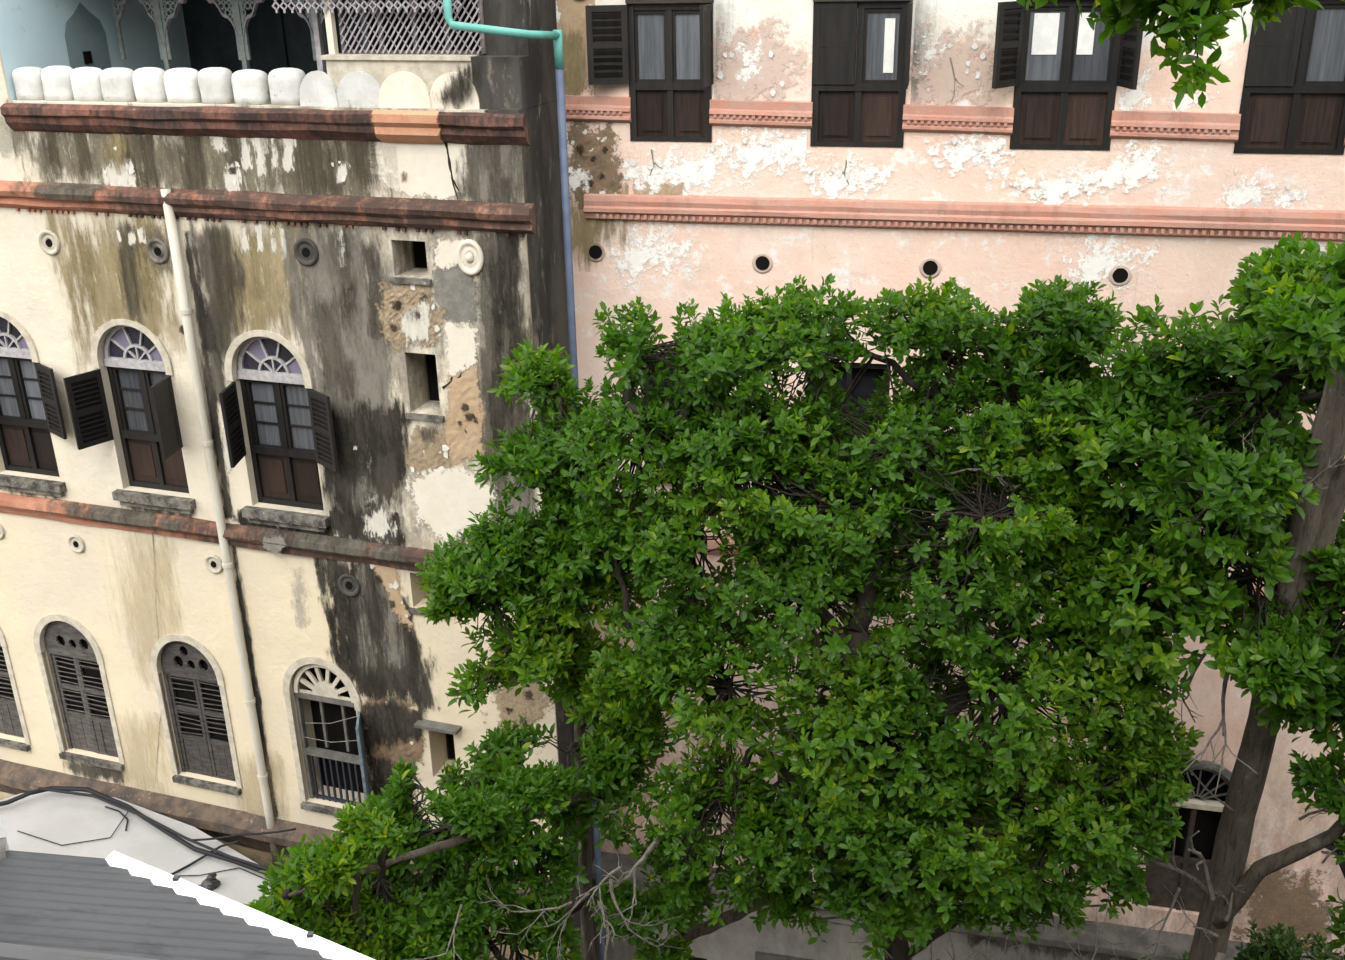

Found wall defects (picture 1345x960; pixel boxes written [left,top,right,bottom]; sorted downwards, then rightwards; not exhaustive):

peeling [715,17,807,102]
water stain [0,118,377,201]
flaking render [567,121,894,210]
peeling [924,133,1171,206]
water stain [71,231,96,316]
flaking render [375,278,447,355]
flaking render [405,364,487,475]
water stain [467,231,539,525]
water stain [9,490,192,533]
water stain [115,221,439,818]
water stain [480,677,556,732]